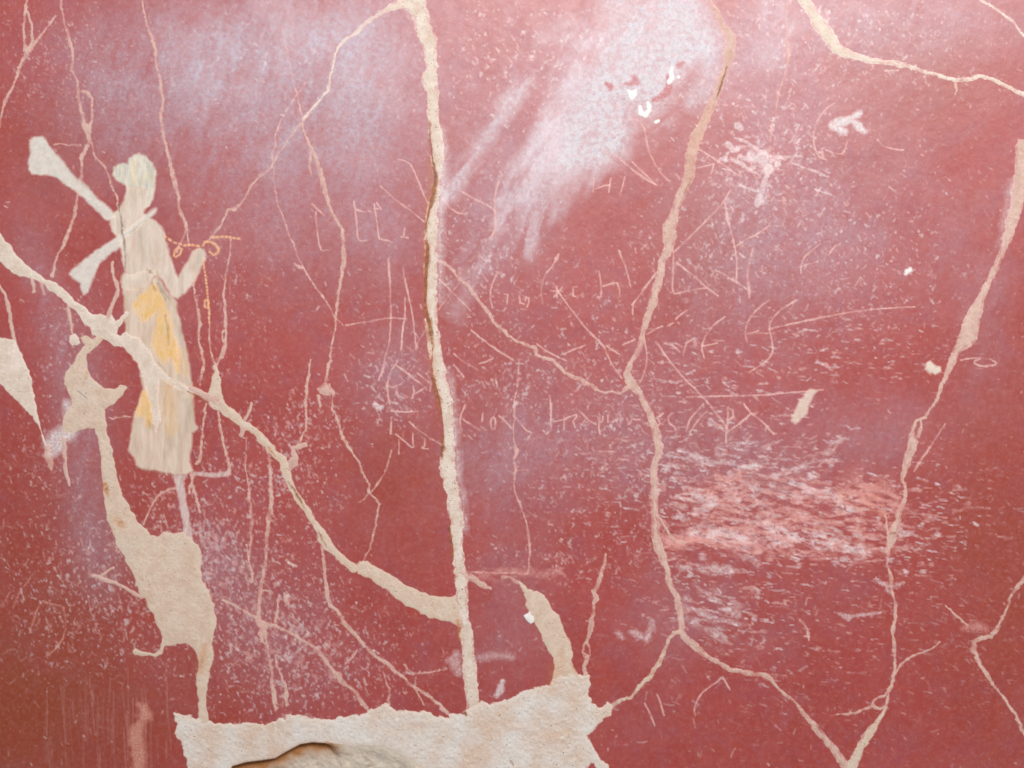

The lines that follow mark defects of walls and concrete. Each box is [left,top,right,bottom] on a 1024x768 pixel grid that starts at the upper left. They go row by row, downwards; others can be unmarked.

crack [1,0,119,277]
crack [142,3,189,253]
water stain [558,0,712,169]
crack [192,178,258,377]
flaking render [0,234,612,768]
crack [189,403,449,714]
crack [271,0,1024,768]